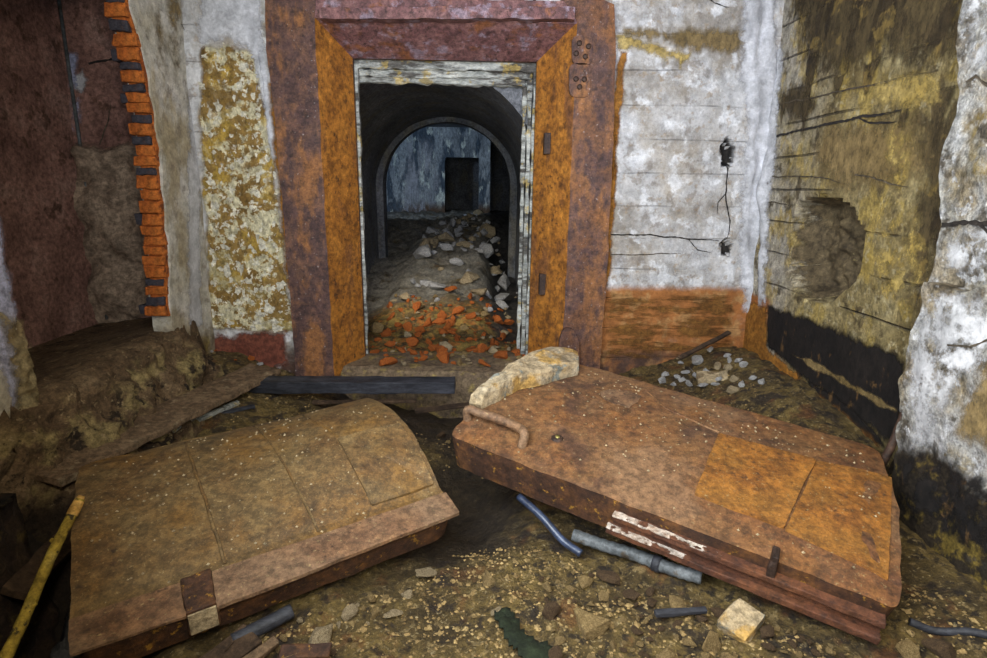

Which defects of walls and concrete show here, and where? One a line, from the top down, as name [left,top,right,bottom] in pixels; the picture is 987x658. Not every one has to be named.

water stain [623,28,746,52]
water stain [198,0,276,158]
crack [776,70,937,106]
crack [776,107,914,137]
water stain [187,98,202,327]
rust [268,83,289,288]
crack [766,174,907,206]
water stain [779,0,962,317]
water stain [808,381,884,447]